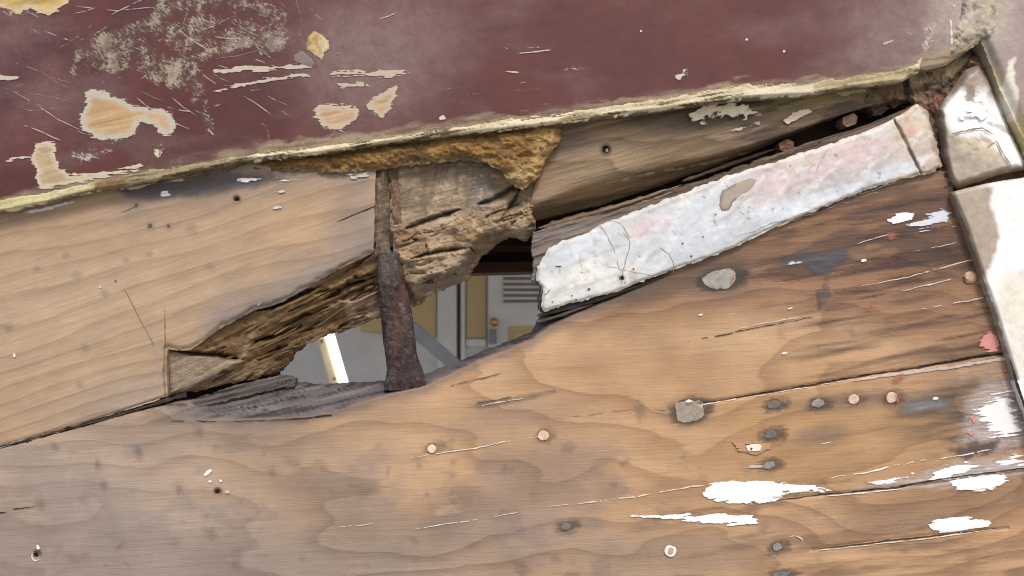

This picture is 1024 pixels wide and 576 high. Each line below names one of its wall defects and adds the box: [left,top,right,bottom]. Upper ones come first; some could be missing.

peeling [0,0,69,15]
peeling [213,31,329,92]
peeling [78,89,178,144]
peeling [313,69,410,132]
peeling [689,102,761,132]
peeling [783,108,812,124]
peeling [6,141,144,189]
corrosion [377,251,426,390]
crack [697,353,1006,405]